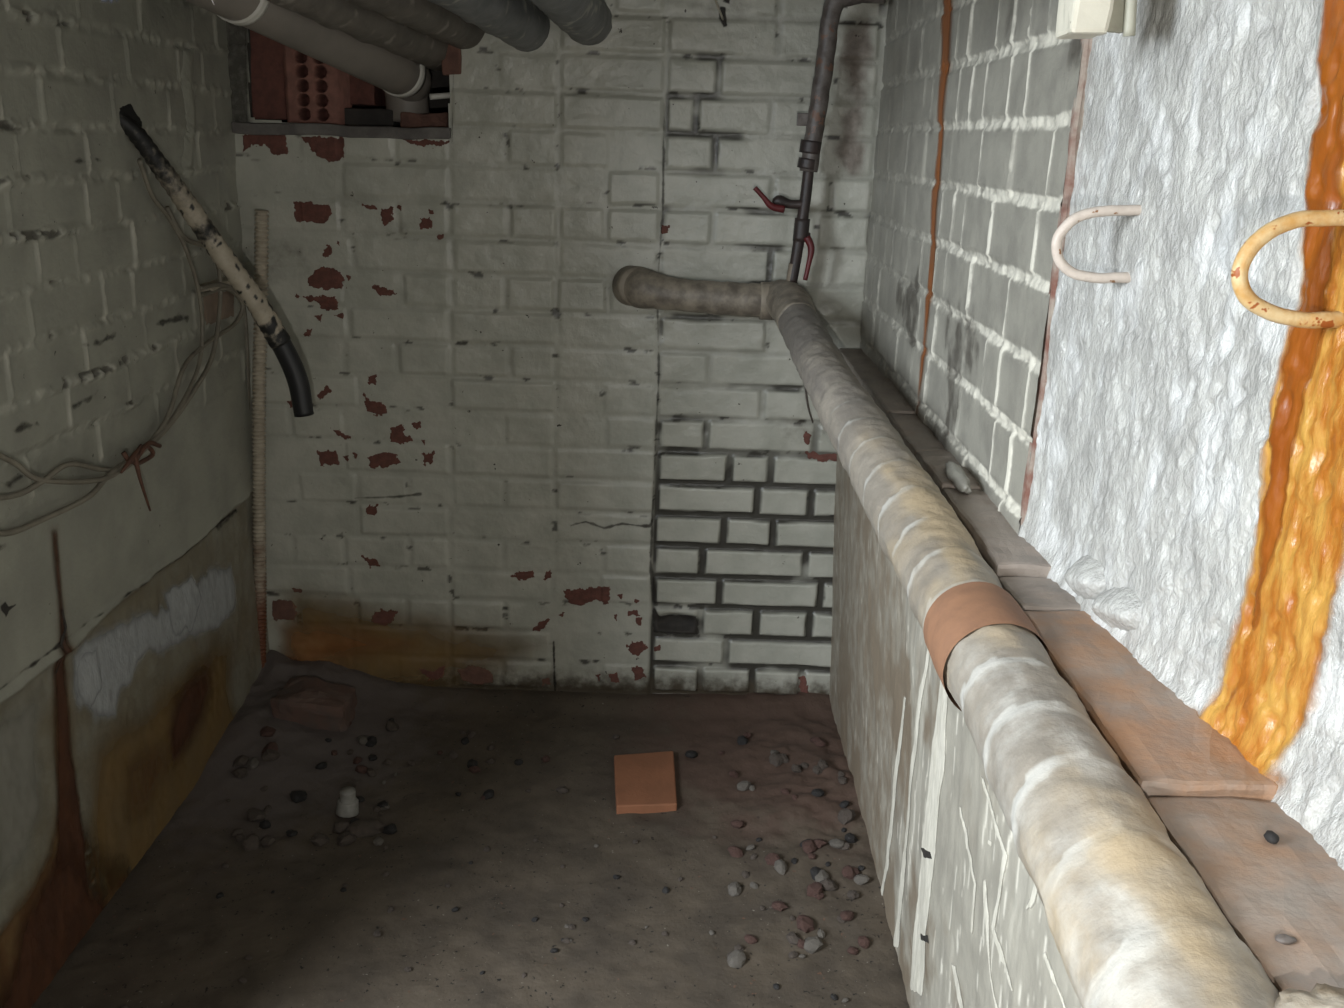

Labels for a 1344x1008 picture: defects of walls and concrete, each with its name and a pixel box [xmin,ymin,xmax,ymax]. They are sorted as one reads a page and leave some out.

peeling [243,134,345,162]
rust [1304,0,1344,210]
peeling [293,201,332,224]
peeling [362,203,402,226]
peeling [419,209,444,240]
peeling [295,241,351,336]
peeling [372,284,397,296]
peeling [316,374,435,469]
rust [1199,226,1344,785]
efflorescence [74,567,236,717]
peeling [272,588,302,621]
rust [0,535,235,1008]